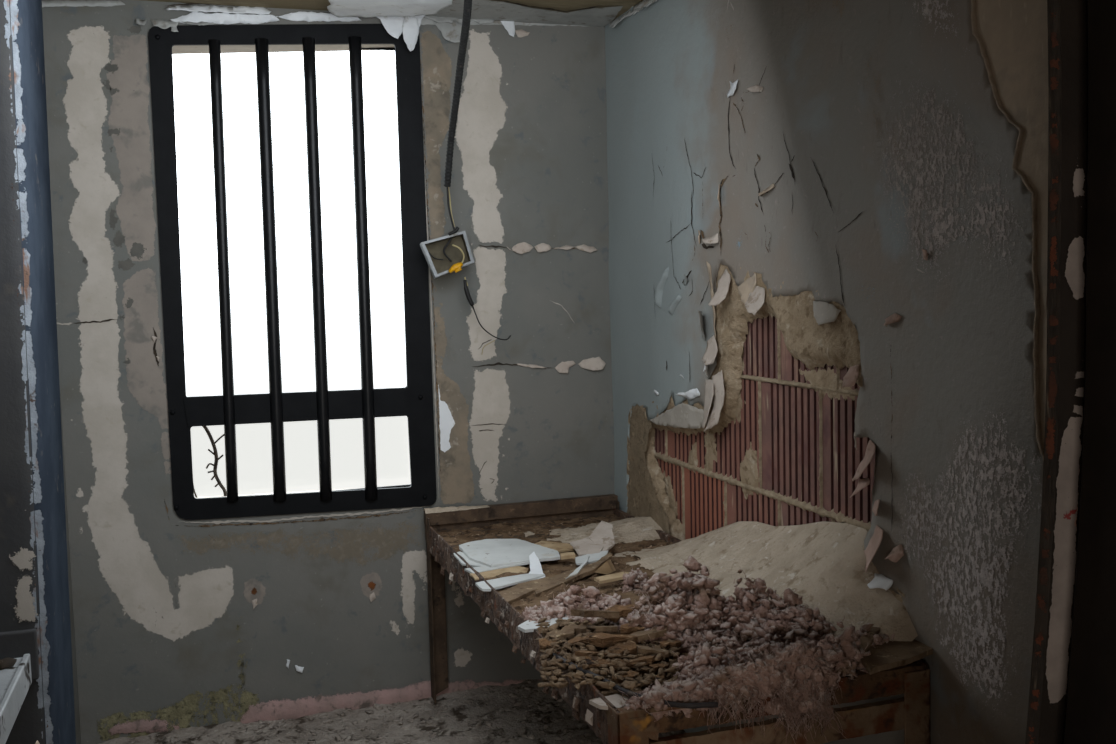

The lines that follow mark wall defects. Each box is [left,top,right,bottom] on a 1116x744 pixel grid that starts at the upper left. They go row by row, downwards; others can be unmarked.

peeling [727,80,763,98]
peeling [62,0,657,654]
crack [668,139,710,304]
peeling [698,230,719,244]
crack [754,134,862,305]
spalling [971,0,1048,460]
peeling [1065,236,1085,300]
peeling [1073,165,1085,207]
spalling [626,261,905,602]
efflorescence [889,407,1042,715]
peeling [1045,367,1084,704]
peeling [454,649,473,667]